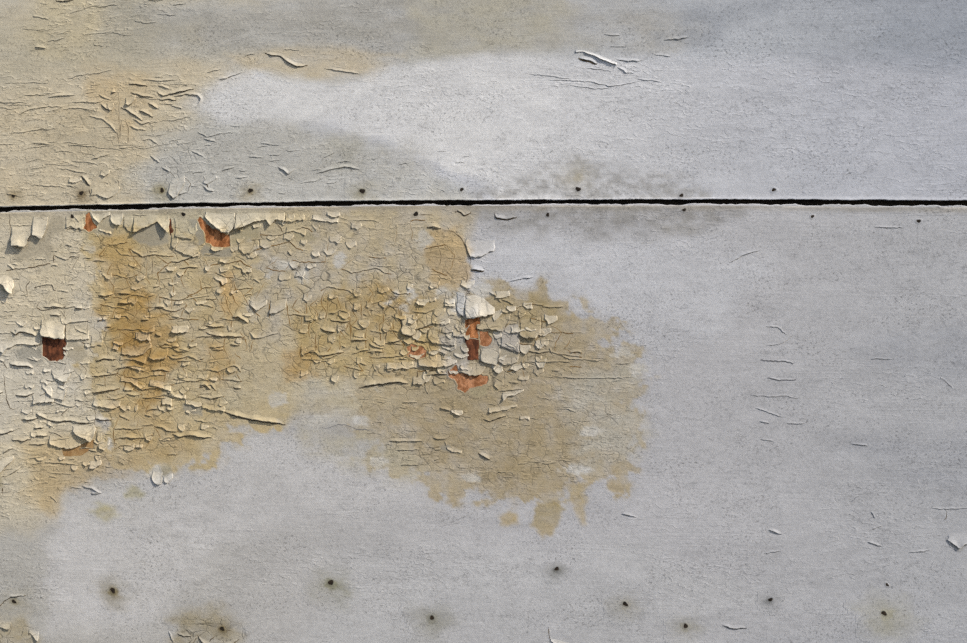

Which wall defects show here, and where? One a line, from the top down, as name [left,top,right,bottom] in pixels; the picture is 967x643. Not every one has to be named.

peeling [66,170,120,199]
peeling [150,155,247,199]
damp [0,0,411,206]
corrosion [24,217,294,529]
peeling [145,462,177,488]
peeling [0,210,379,475]
peeling [328,213,564,422]
damp [0,145,967,544]
peeling [556,456,596,477]
peeling [946,533,967,552]